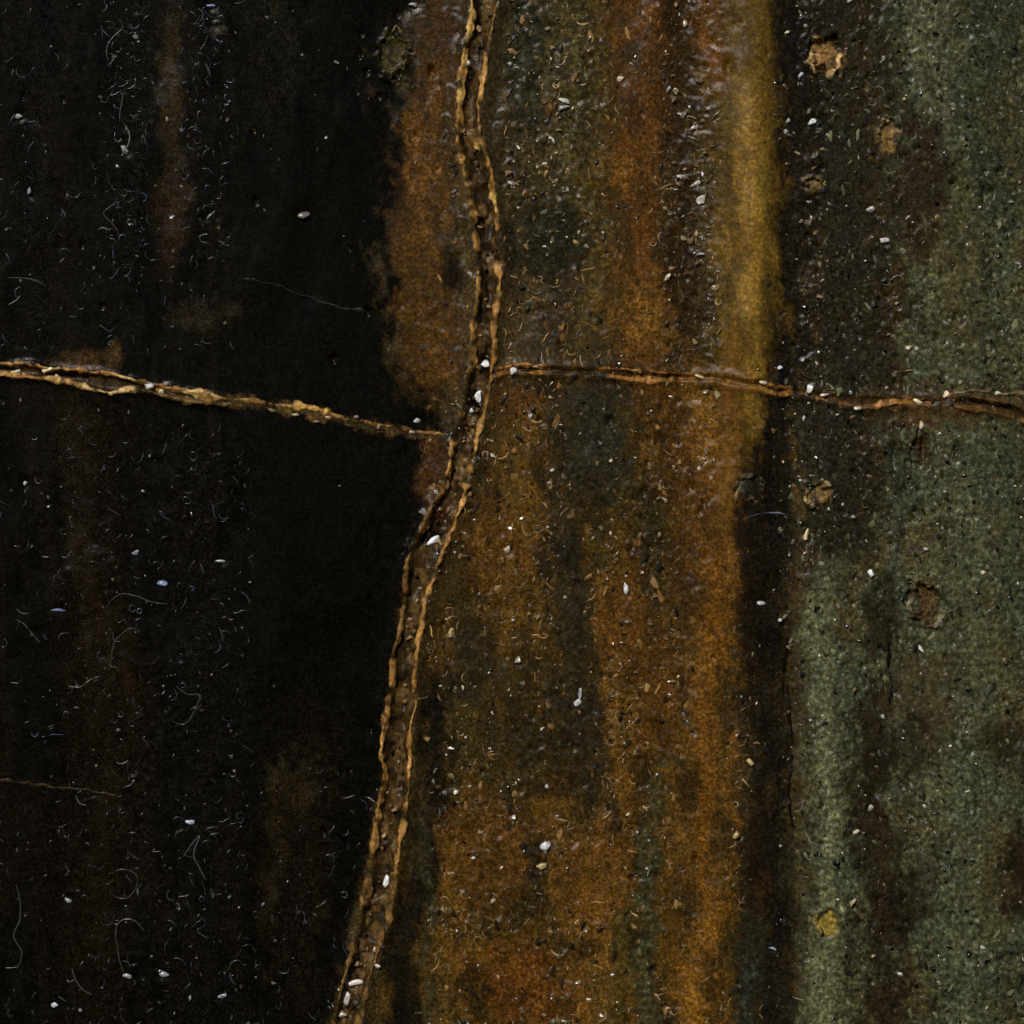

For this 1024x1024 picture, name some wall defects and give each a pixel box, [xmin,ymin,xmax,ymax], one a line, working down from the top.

crack [0,779,114,796]
crack [0,361,443,439]
crack [246,278,362,311]
corrosion [380,0,750,1024]
crack [333,0,1024,1024]
water stain [731,0,1024,1024]